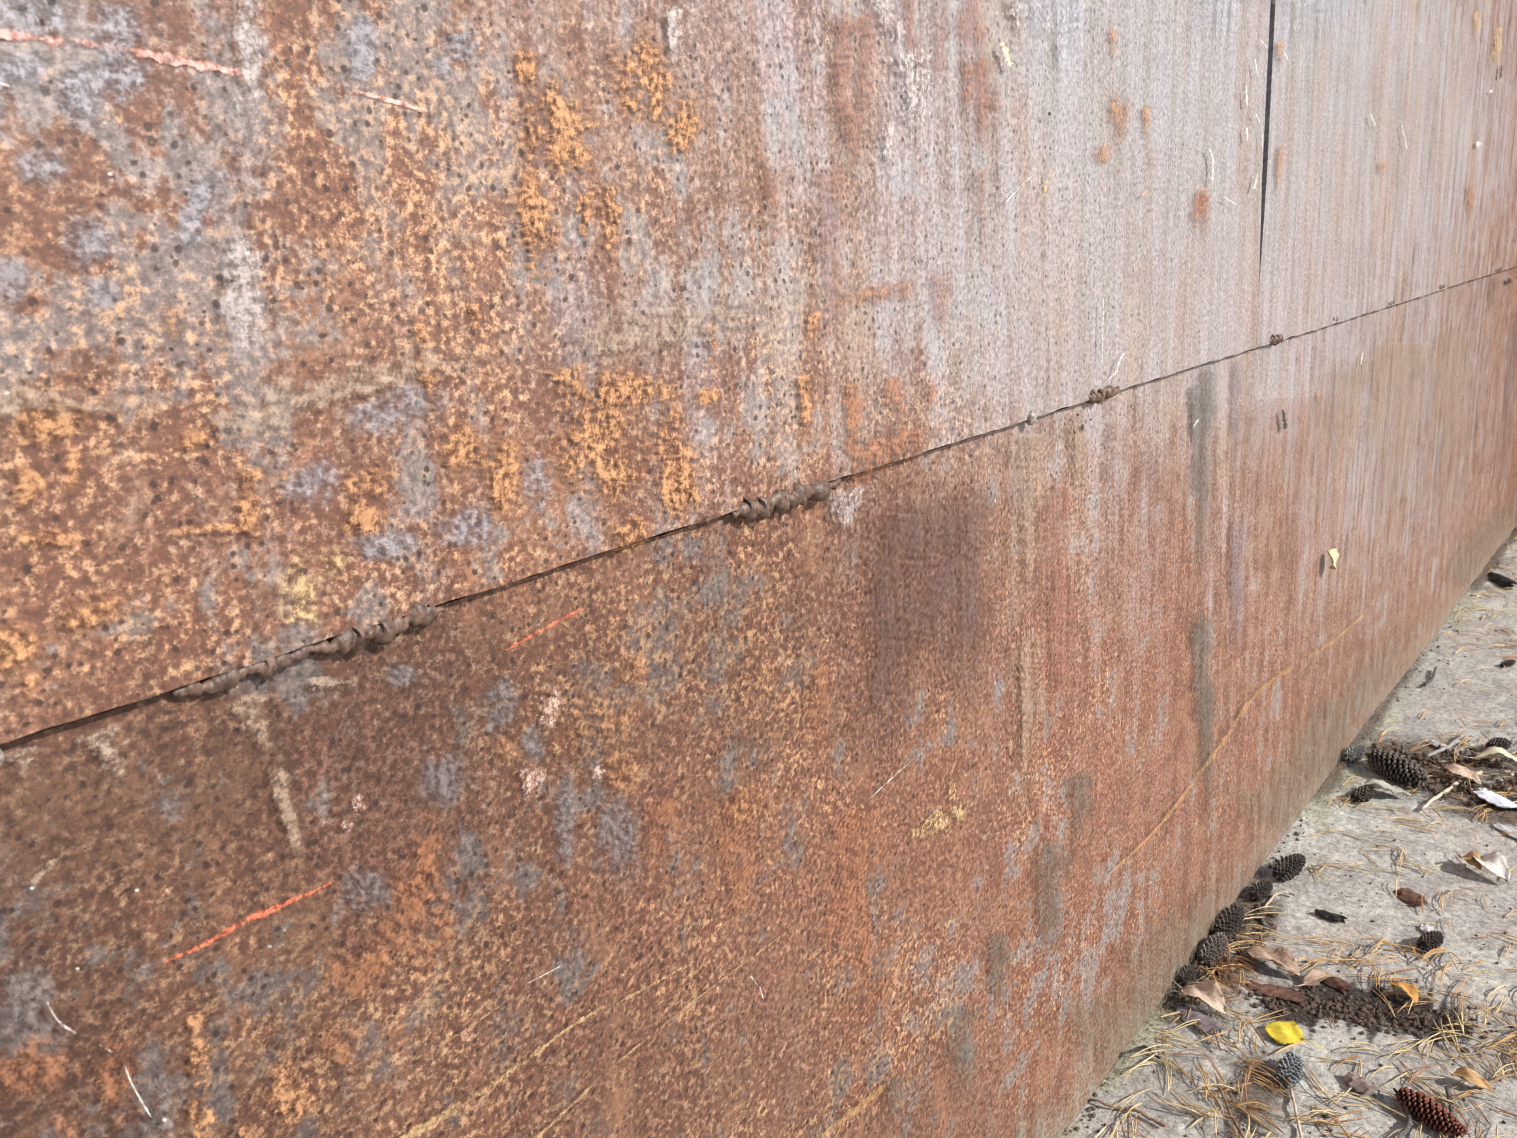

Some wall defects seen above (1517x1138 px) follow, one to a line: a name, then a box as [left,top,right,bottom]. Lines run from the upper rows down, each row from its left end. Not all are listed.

rust [614,31,701,155]
rust [515,49,624,277]
rust [21,397,82,487]
rust [174,467,287,536]
rust [345,467,396,536]
rust [446,423,519,516]
rust [549,364,701,518]
damp [1011,434,1042,562]
rust [0,626,41,697]
damp [1020,644,1043,761]
rust [187,1010,215,1138]
rust [270,1063,316,1124]